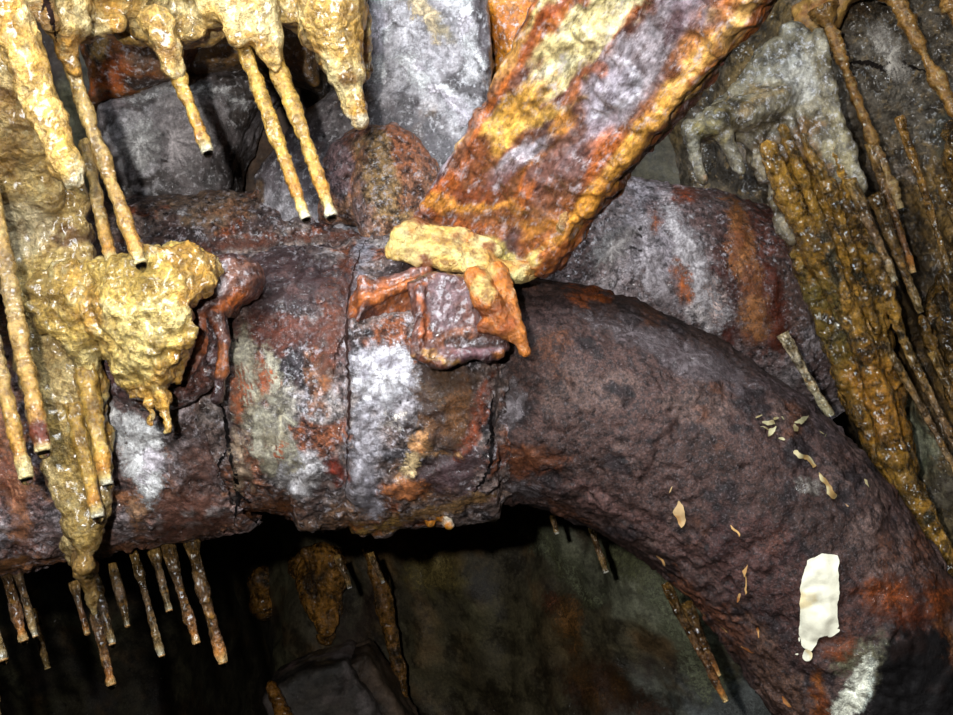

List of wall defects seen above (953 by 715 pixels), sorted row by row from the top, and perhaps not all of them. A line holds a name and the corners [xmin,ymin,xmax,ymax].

damp [116,108,205,178]
damp [190,84,248,111]
damp [866,20,914,83]
corrosion [200,232,354,393]
corrosion [707,200,788,353]
corrosion [0,406,34,572]
damp [107,396,196,510]
corrosion [155,443,233,543]
corrosion [230,364,273,420]
damp [228,324,321,498]
damp [344,339,489,521]
peeling [795,553,840,661]